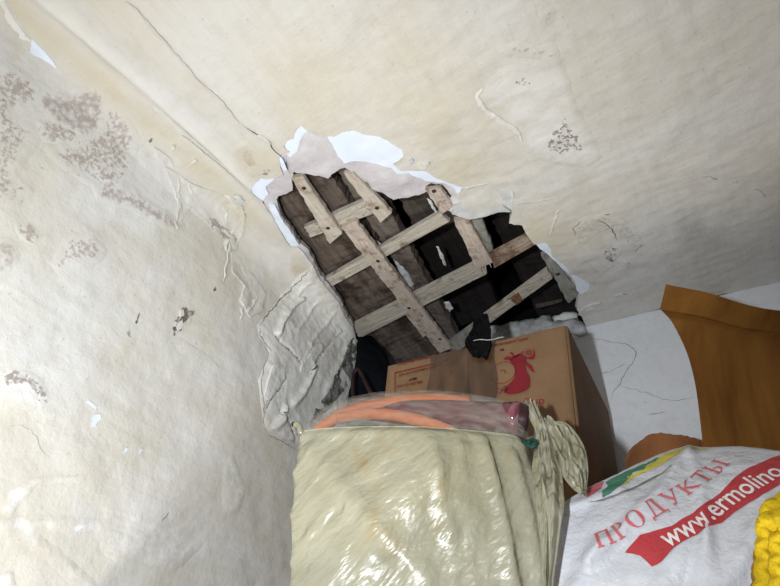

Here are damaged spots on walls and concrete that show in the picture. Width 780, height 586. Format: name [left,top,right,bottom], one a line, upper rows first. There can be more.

peeling [30,39,57,69]
crack [126,2,290,175]
water stain [548,119,581,154]
spalling [172,305,195,337]
flaking render [251,126,512,429]
flaking render [490,243,601,341]
crack [596,339,692,415]